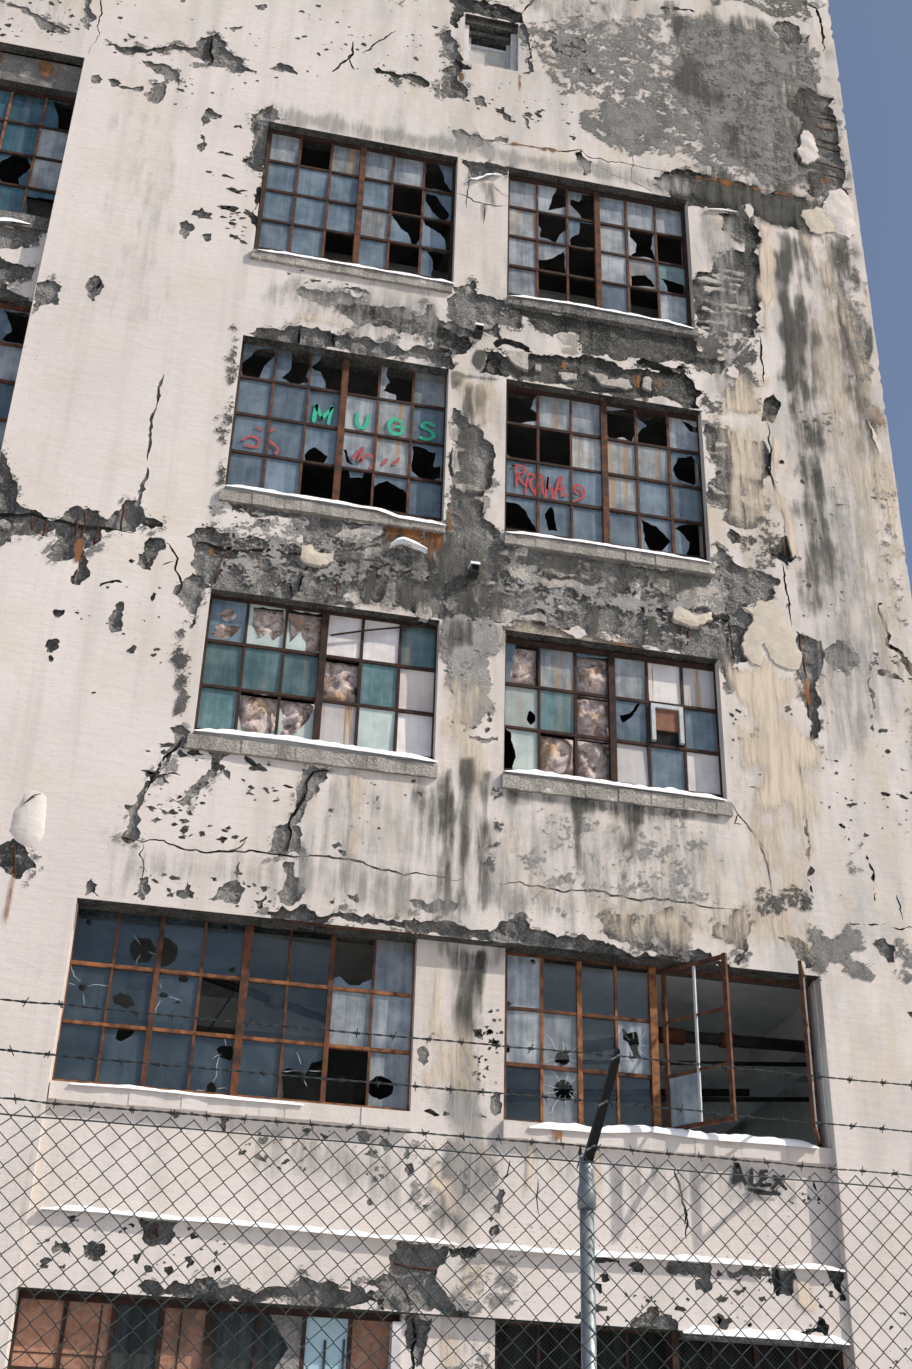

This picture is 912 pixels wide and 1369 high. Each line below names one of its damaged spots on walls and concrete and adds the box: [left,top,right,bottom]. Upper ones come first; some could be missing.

crack [88,0,103,54]
spalling [0,0,318,108]
spalling [0,225,104,314]
leakage [286,0,901,734]
spalling [0,440,167,585]
crack [134,375,183,595]
peeling [106,0,912,984]
spalling [0,838,43,919]
crack [111,836,463,881]
leakage [438,682,503,913]
leakage [571,797,689,866]
leakage [425,951,491,1228]